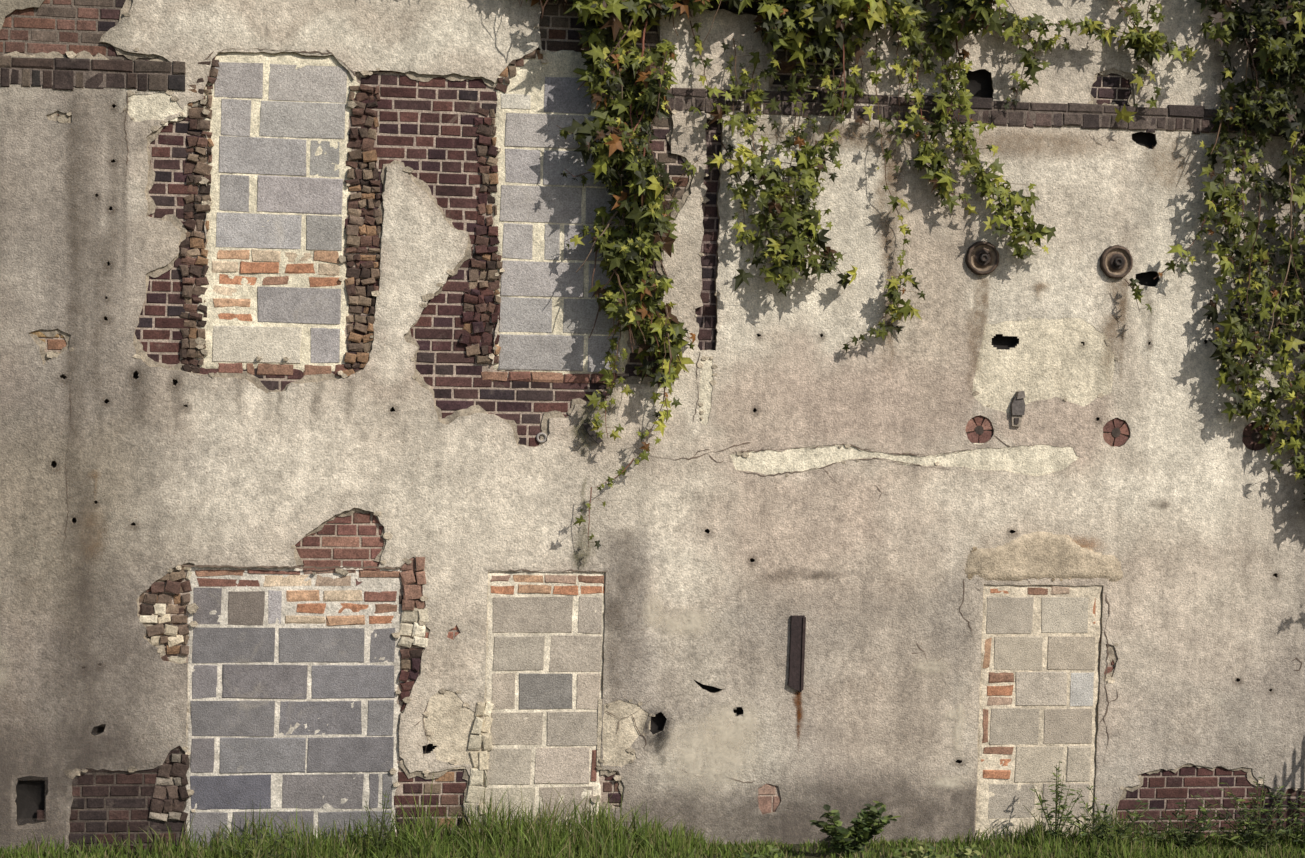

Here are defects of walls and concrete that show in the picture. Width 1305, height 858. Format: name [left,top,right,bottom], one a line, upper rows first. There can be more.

spalling [0,0,169,62]
spalling [520,0,587,63]
spalling [615,10,660,52]
spalling [123,68,665,447]
spalling [631,110,722,425]
spalling [29,328,74,365]
crack [631,354,1029,498]
spalling [136,563,199,664]
crack [1097,595,1118,764]
spalling [64,746,195,852]
flaking render [591,699,655,810]
spalling [1109,763,1305,839]